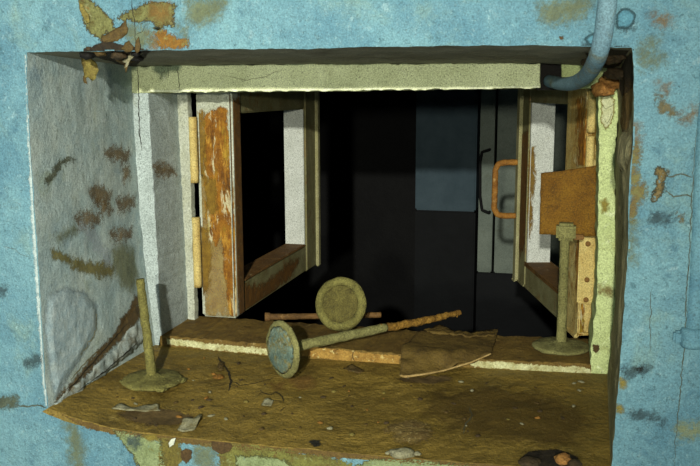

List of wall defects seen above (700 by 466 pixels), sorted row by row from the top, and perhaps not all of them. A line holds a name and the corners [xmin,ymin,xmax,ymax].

peeling [78,0,177,84]
crack [135,68,143,150]
water stain [44,156,74,185]
rust [197,93,300,317]
peeling [25,55,500,466]